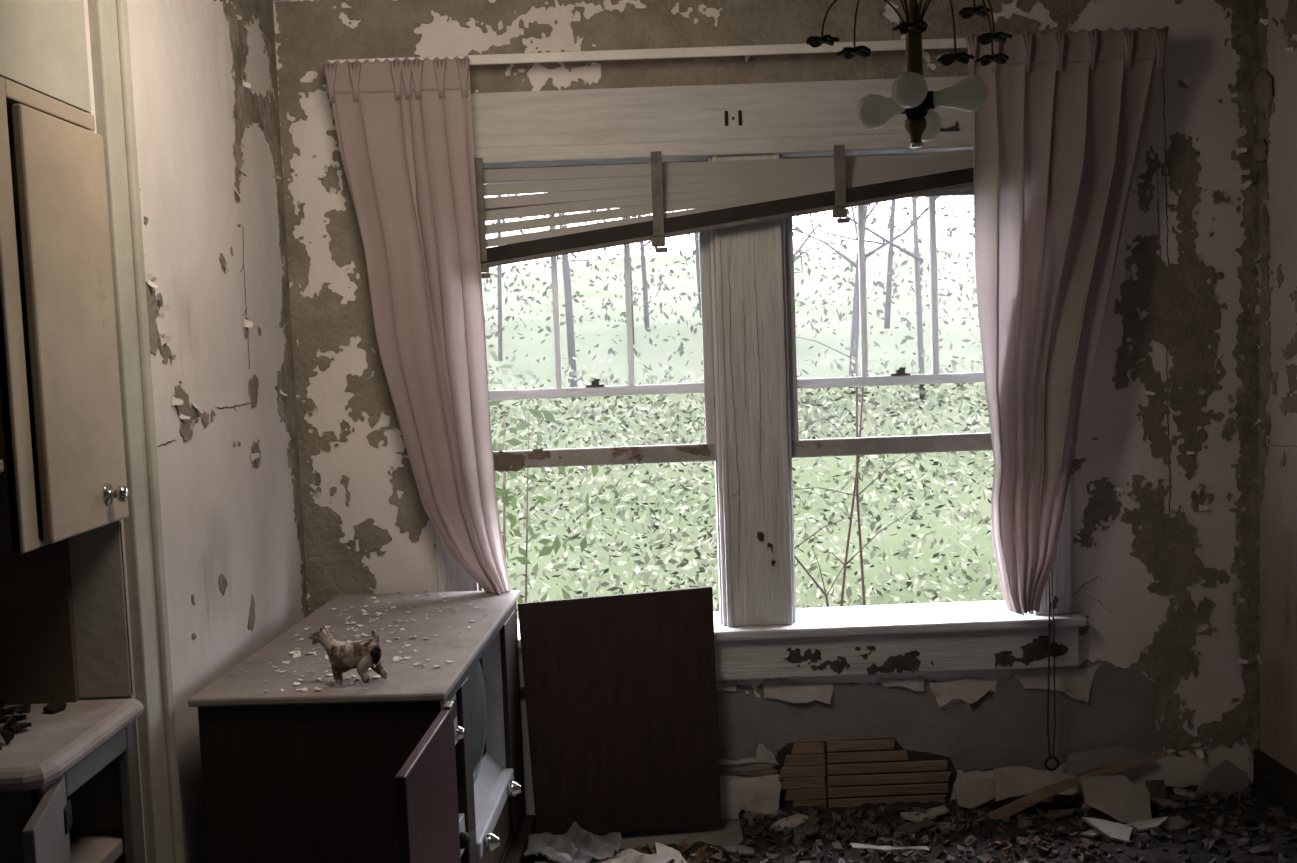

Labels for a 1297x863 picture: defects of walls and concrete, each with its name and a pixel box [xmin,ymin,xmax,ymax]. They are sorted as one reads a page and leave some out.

peeling [145,273,176,364]
peeling [214,0,1096,617]
peeling [171,381,215,442]
peeling [716,0,1297,771]
peeling [247,595,255,631]